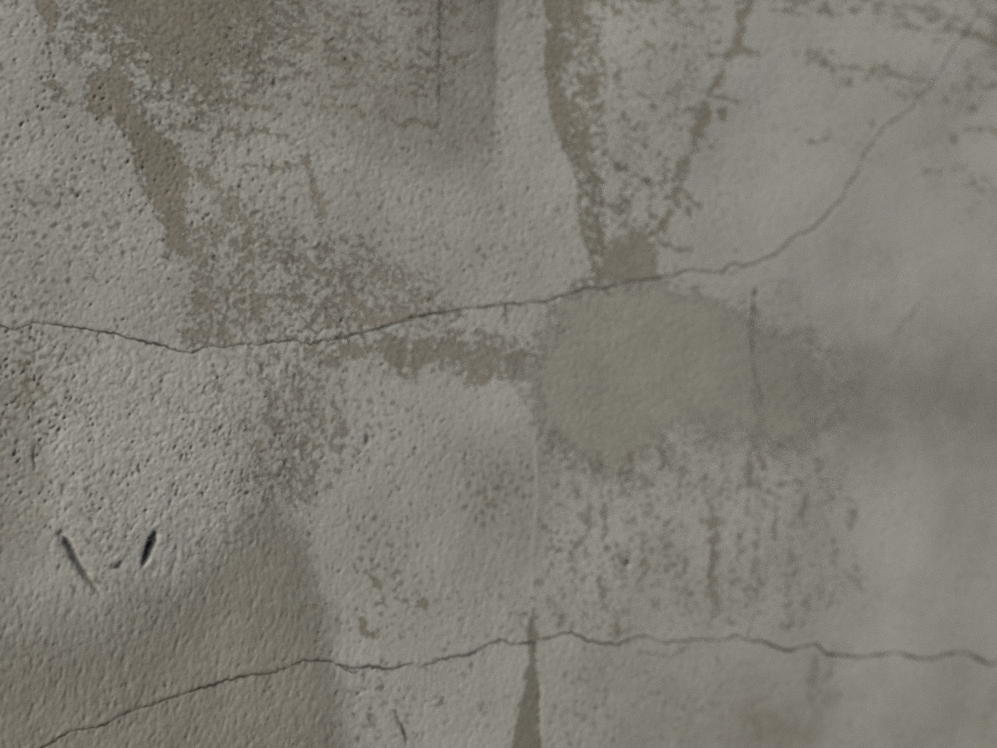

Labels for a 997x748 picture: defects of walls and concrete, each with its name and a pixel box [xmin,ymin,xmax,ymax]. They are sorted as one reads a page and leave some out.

spalling [771,0,997,51]
crack [0,16,977,354]
peeling [537,432,863,637]
crack [40,631,997,748]
peeling [512,563,554,748]